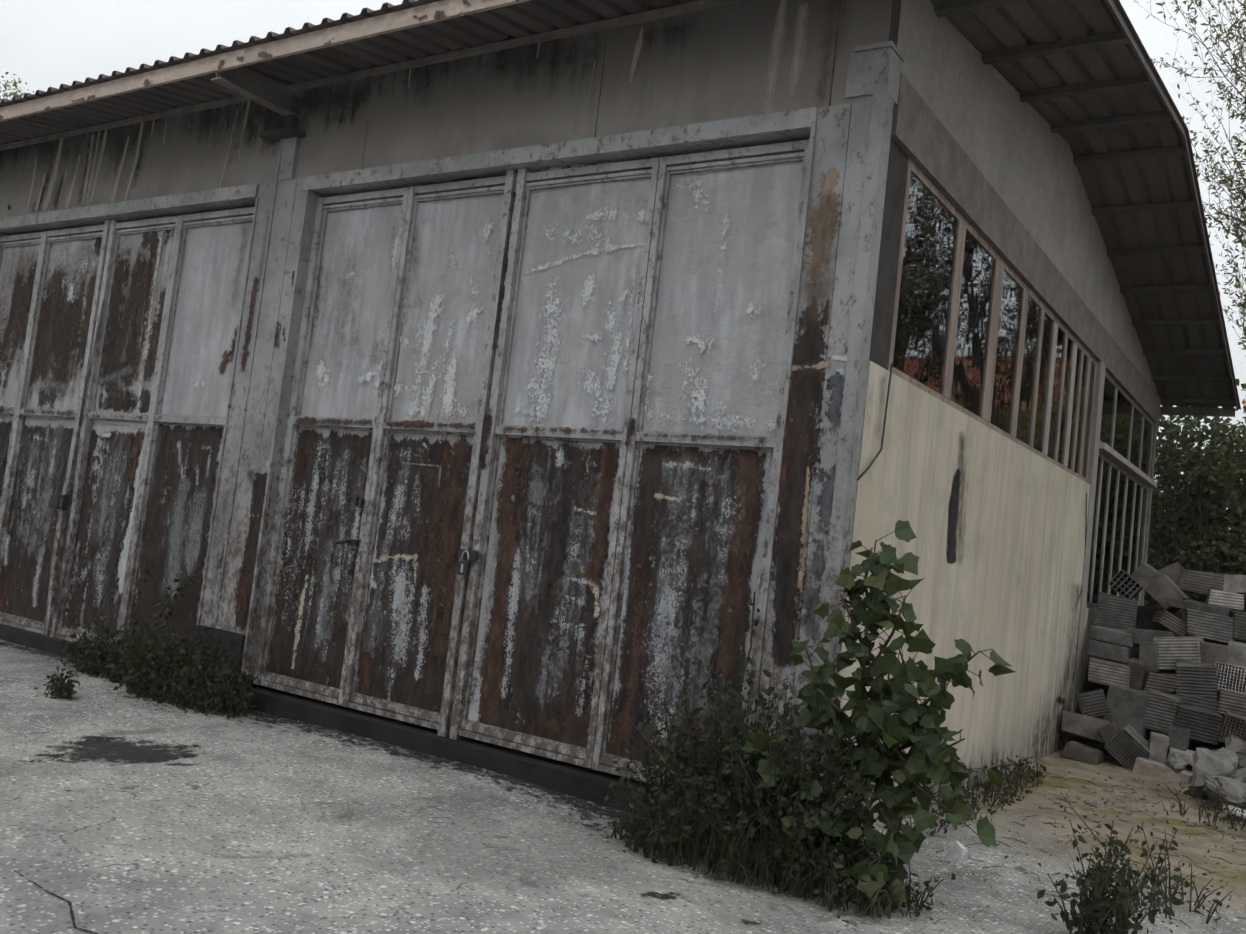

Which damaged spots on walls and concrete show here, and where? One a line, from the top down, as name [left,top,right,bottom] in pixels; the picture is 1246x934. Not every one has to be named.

damp [764,0,806,114]
damp [25,129,108,212]
damp [111,117,168,203]
rust [0,229,227,651]
rust [229,457,274,631]
rust [267,416,372,689]
peeling [353,238,484,422]
peeling [512,205,647,429]
rust [356,168,841,768]
peeling [643,331,778,434]
damp [24,732,204,765]
crack [6,870,120,934]